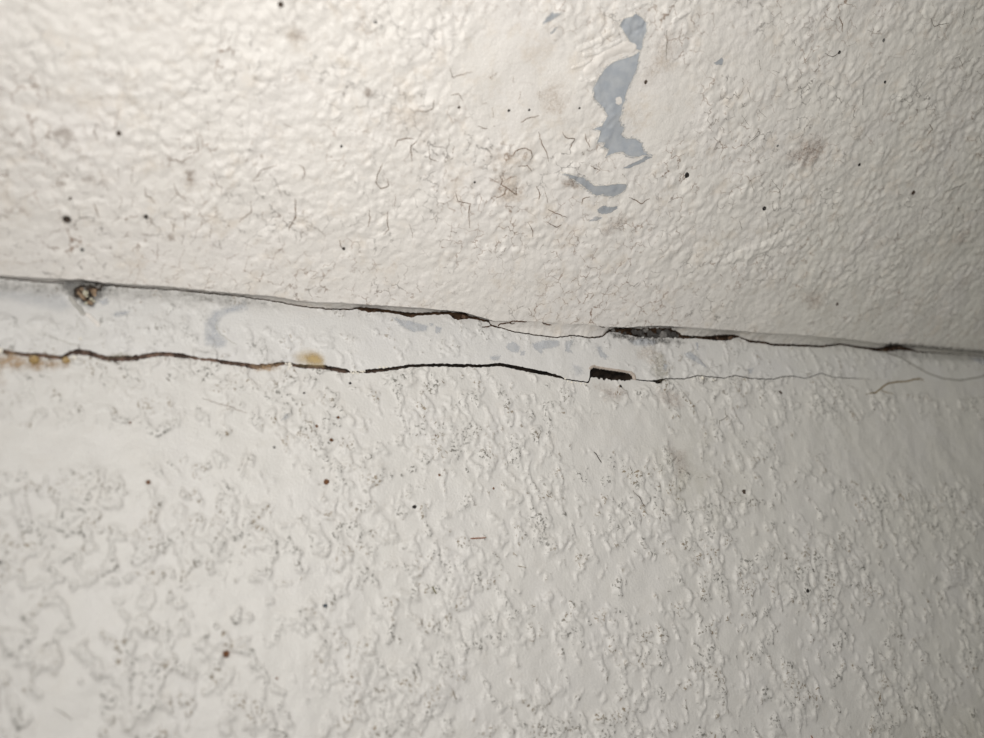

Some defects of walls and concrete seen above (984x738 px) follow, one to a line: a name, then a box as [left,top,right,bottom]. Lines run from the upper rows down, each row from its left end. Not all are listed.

peeling [592,12,653,168]
peeling [560,172,628,214]
crack [2,276,81,284]
crack [105,285,984,357]
crack [0,334,924,394]